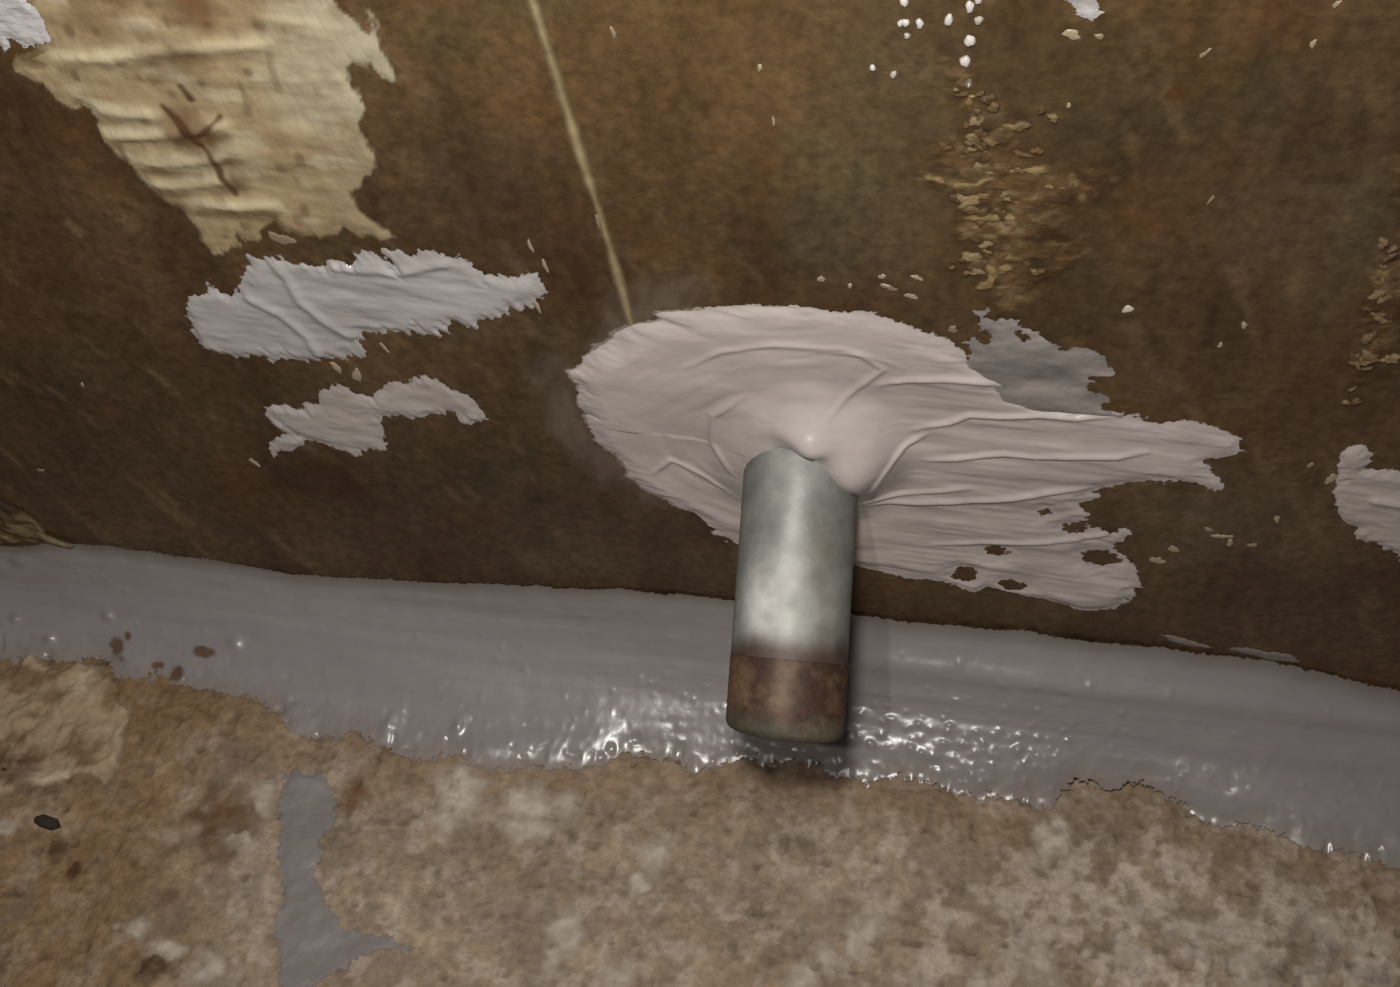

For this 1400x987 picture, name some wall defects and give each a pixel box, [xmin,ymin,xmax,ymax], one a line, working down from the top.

peeling [13,0,395,255]